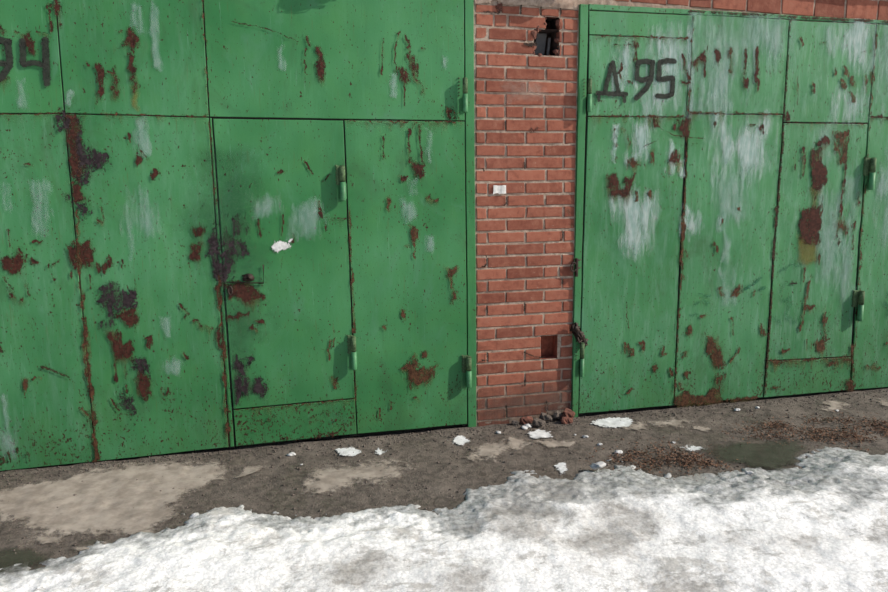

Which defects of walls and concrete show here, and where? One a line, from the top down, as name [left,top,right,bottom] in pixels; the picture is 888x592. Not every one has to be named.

rust [86,27,213,152]
rust [394,31,424,106]
spalling [531,16,560,57]
rust [0,112,124,463]
rust [108,308,170,402]
rust [136,150,161,181]
rust [179,274,357,443]
rust [318,200,356,333]
rust [402,350,439,399]
spalling [541,335,558,359]
rust [591,17,857,408]
rust [794,34,888,290]